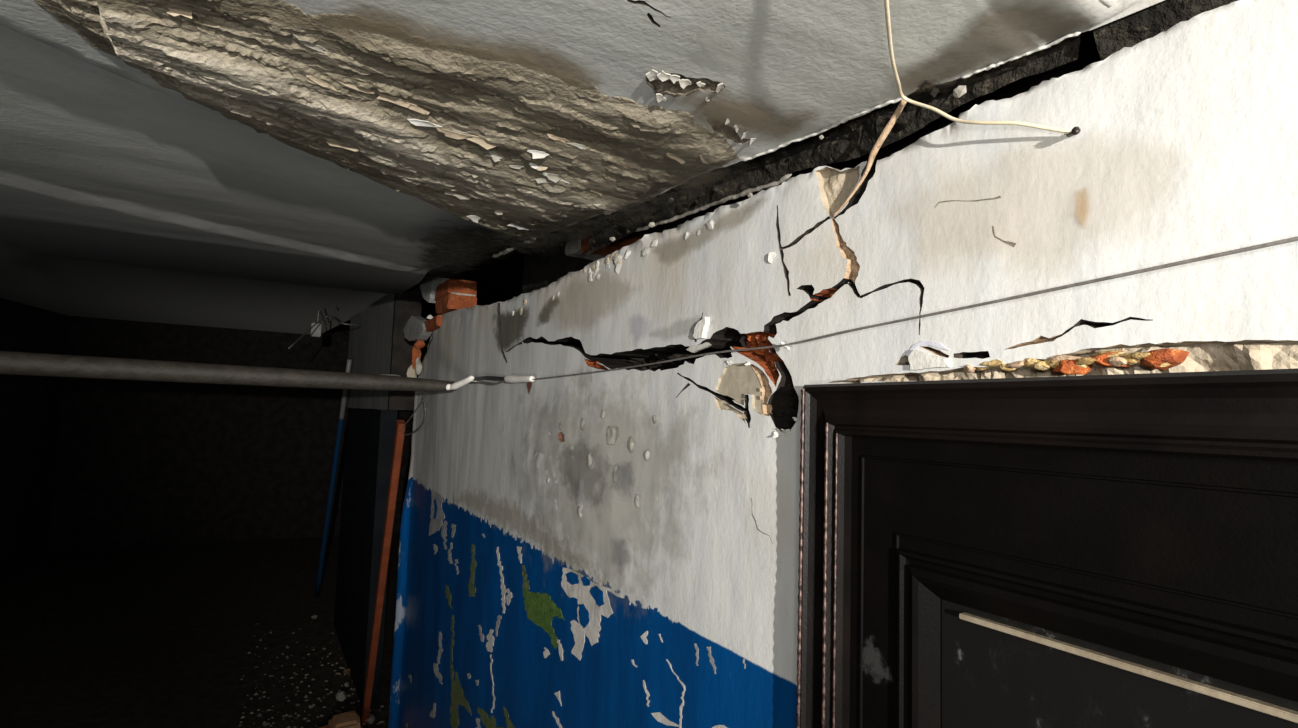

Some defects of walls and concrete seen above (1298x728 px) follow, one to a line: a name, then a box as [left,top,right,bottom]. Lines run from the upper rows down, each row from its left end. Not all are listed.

crack [627,0,671,27]
flaking render [34,0,756,240]
crack [934,196,1016,247]
spalling [583,239,658,282]
crack [497,205,924,438]
spalling [829,317,1298,383]
peeling [429,490,623,728]
peeling [694,643,716,674]
peeling [631,659,685,728]